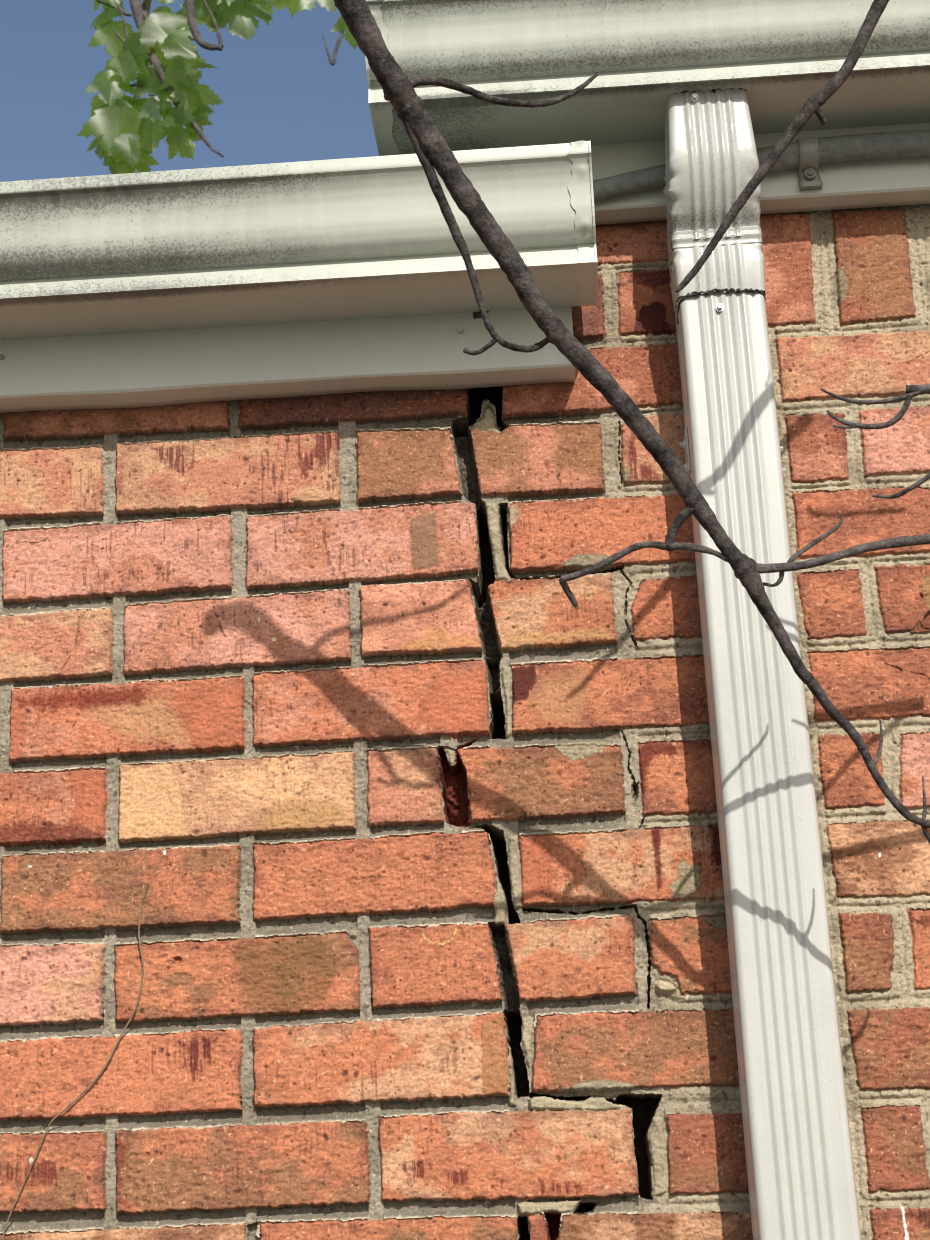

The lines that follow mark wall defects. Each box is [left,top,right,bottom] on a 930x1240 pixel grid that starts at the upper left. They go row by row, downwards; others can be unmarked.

crack [437,386,670,1201]
crack [517,1199,601,1240]